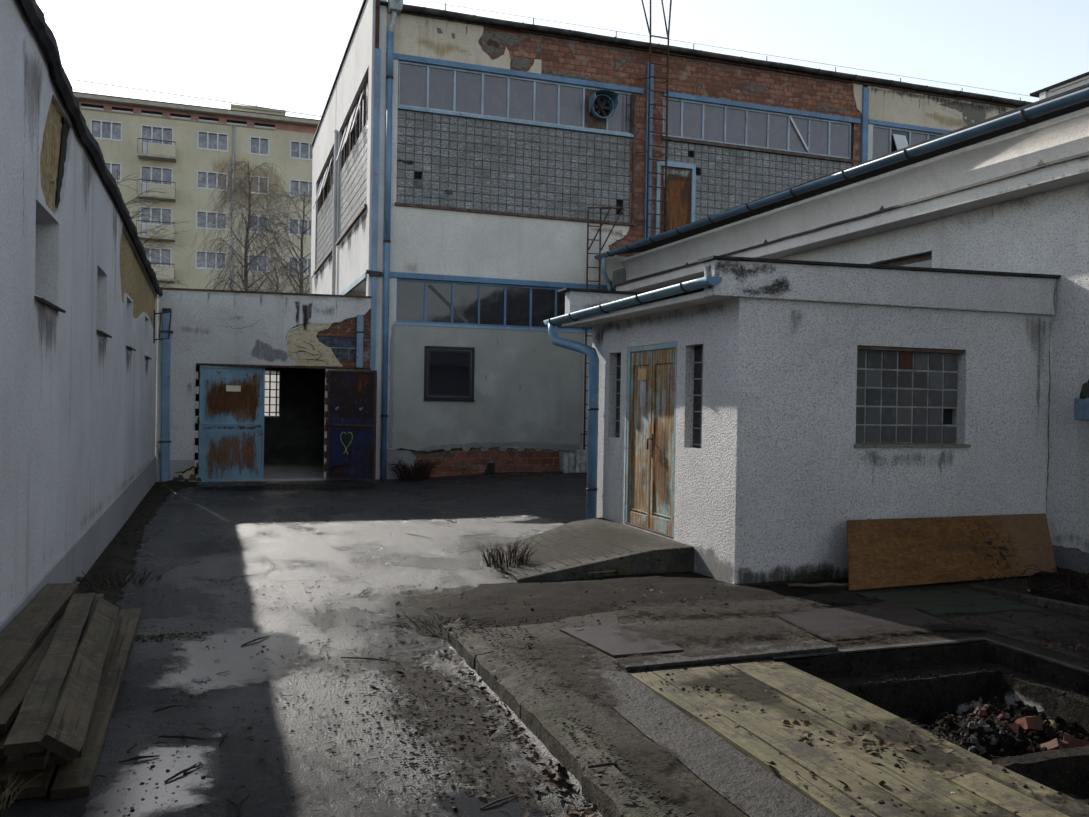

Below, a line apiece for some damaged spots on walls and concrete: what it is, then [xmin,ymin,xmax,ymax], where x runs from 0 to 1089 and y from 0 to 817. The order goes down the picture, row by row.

flaking render [478,26,863,257]
flaking render [252,308,371,368]
rust [205,374,260,477]
flaking render [416,441,579,477]
spalling [770,637,1089,805]